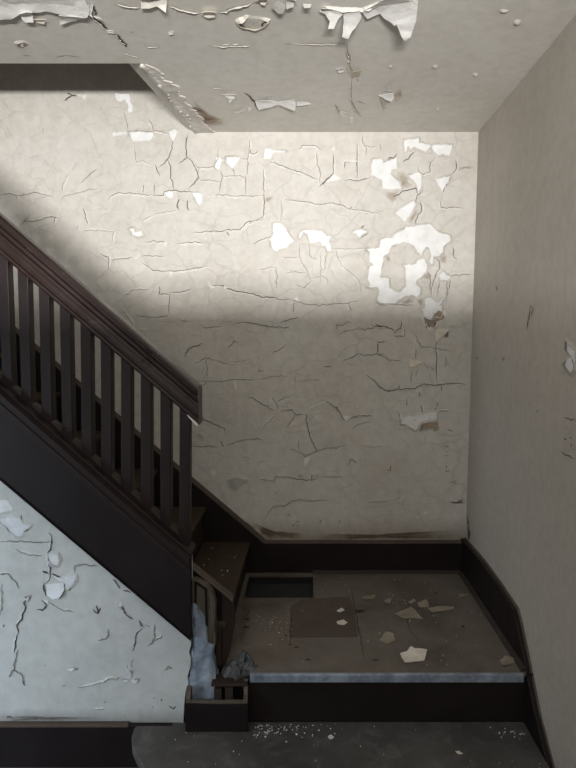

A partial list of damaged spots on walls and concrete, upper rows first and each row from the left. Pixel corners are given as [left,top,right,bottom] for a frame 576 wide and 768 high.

peeling [0,0,102,25]
peeling [235,0,418,41]
flaking render [139,63,216,143]
peeling [235,100,310,114]
crack [300,43,361,117]
peeling [349,136,454,341]
crack [0,119,472,526]
crack [0,515,98,686]
peeling [43,550,79,604]
crack [93,605,111,642]
crack [113,579,162,650]
crack [75,668,120,688]